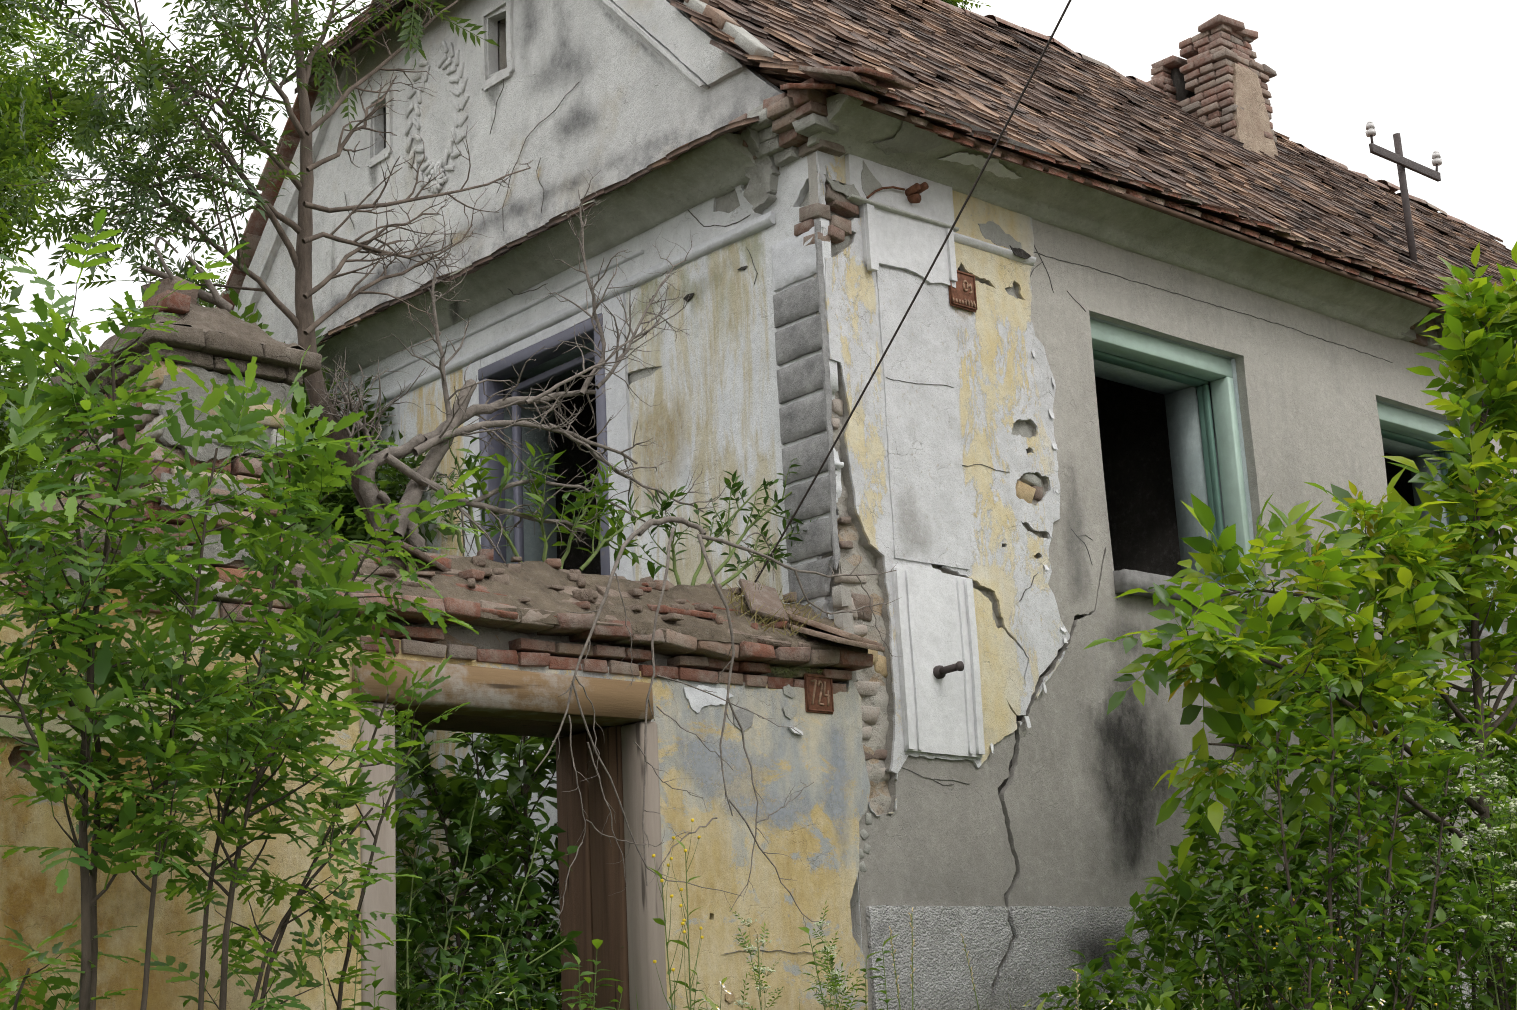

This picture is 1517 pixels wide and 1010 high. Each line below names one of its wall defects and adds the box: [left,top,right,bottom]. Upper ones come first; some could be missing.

peeling [978,221,1031,259]
flaking render [1011,421,1034,438]
flaking render [1015,473,1059,505]
flaking render [822,391,891,815]
flaking render [973,584,1000,628]
crack [1039,615,1083,678]
peeling [683,685,754,732]
peeling [783,684,803,736]
crack [901,716,1023,795]